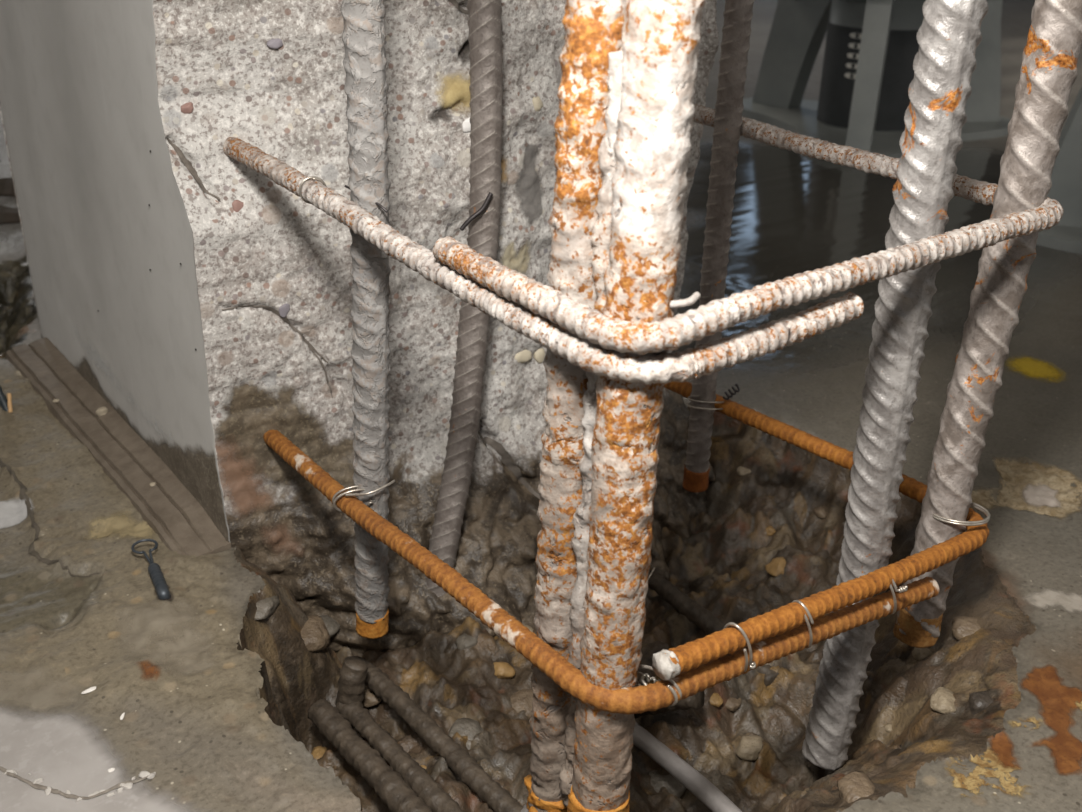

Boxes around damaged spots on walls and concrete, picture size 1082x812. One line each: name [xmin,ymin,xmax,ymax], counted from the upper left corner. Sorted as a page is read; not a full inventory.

crack [167,138,220,200]
crack [222,305,333,398]
water stain [0,499,32,529]
crack [0,459,100,577]
spalling [661,411,851,627]
spalling [888,492,922,565]
spalling [970,458,1082,518]
spalling [233,546,533,812]
spalling [629,548,1037,812]
corrosion [946,665,1082,796]
crack [0,766,156,802]